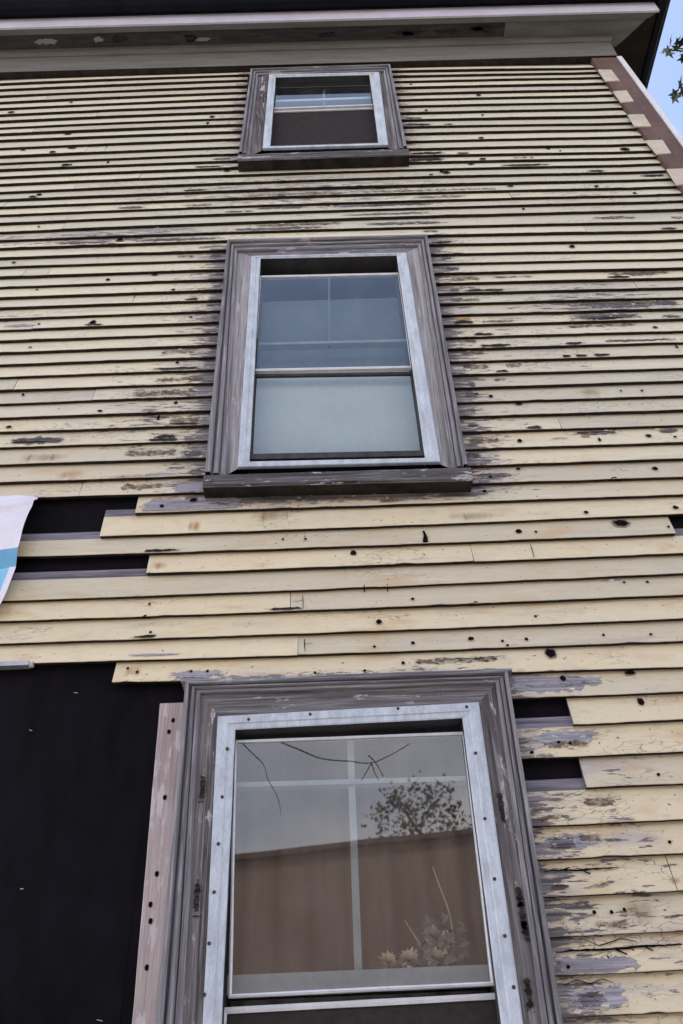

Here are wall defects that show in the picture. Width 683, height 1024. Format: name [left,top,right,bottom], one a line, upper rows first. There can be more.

peeling [58,232,109,245]
peeling [449,276,480,302]
peeling [568,300,681,342]
peeling [6,425,64,445]
peeling [121,449,205,490]
peeling [529,729,603,749]
crack [544,866,618,874]
crack [555,938,683,955]
crack [564,979,614,989]